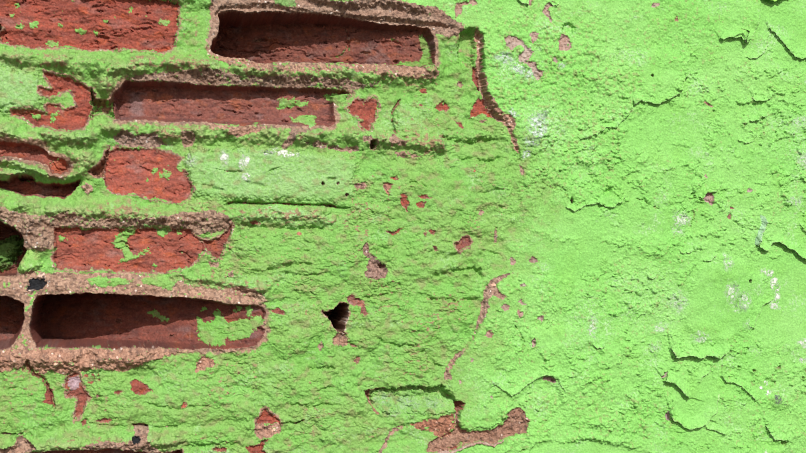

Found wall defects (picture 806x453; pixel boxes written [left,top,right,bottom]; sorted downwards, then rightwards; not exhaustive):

spalling [0,0,526,426]
peeling [0,423,161,453]
flaking render [246,408,282,453]
flaking render [376,401,530,453]